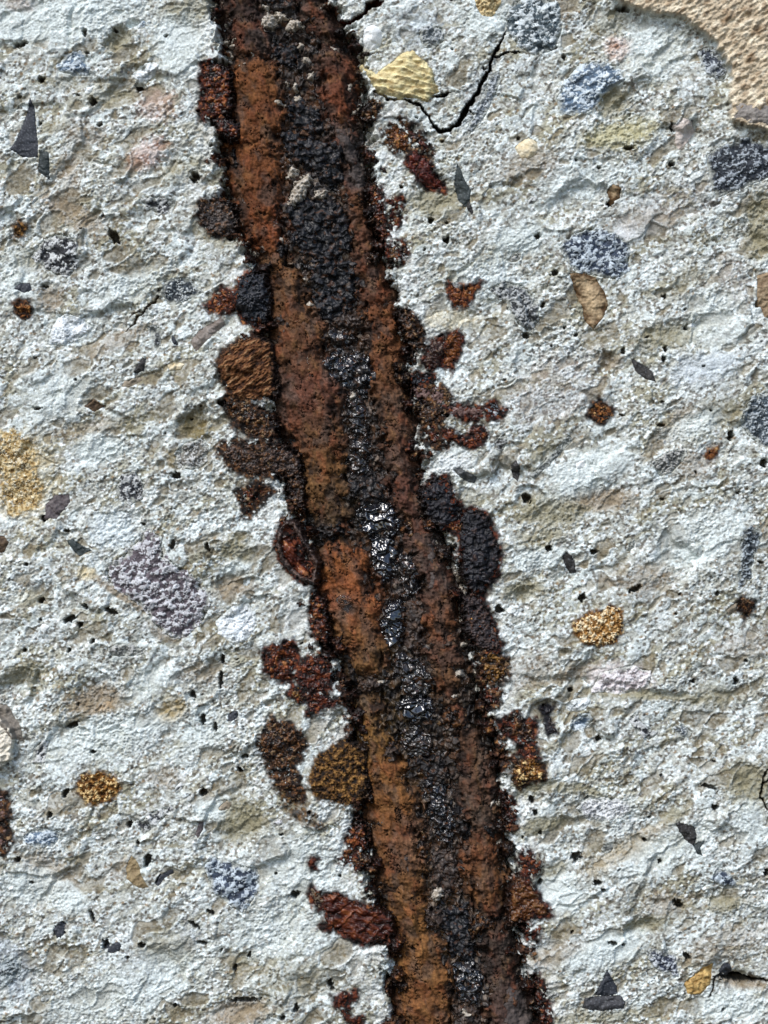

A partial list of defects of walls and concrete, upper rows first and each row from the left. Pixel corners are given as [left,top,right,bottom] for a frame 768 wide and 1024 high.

corrosion [194,0,459,1024]
corrosion [293,0,559,1024]
crack [373,31,519,134]